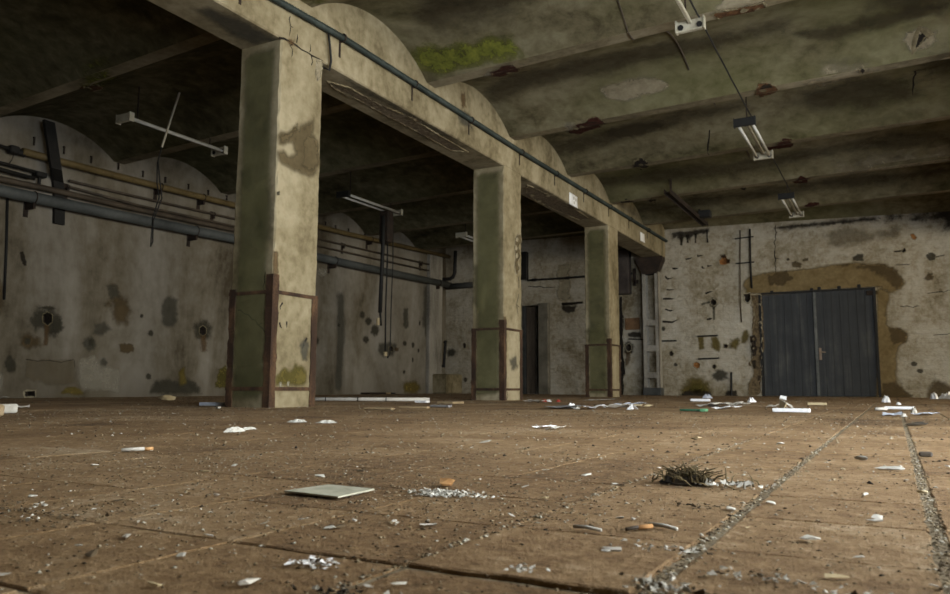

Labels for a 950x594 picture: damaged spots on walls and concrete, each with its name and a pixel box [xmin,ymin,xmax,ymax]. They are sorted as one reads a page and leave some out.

crack [279,16,323,66]
spalling [486,64,523,77]
spalling [755,81,778,98]
spalling [569,117,605,134]
water stain [200,9,319,397]
water stain [777,217,876,230]
water stain [889,211,950,229]
water stain [83,285,143,350]
water stain [162,297,178,326]
water stain [743,254,912,398]